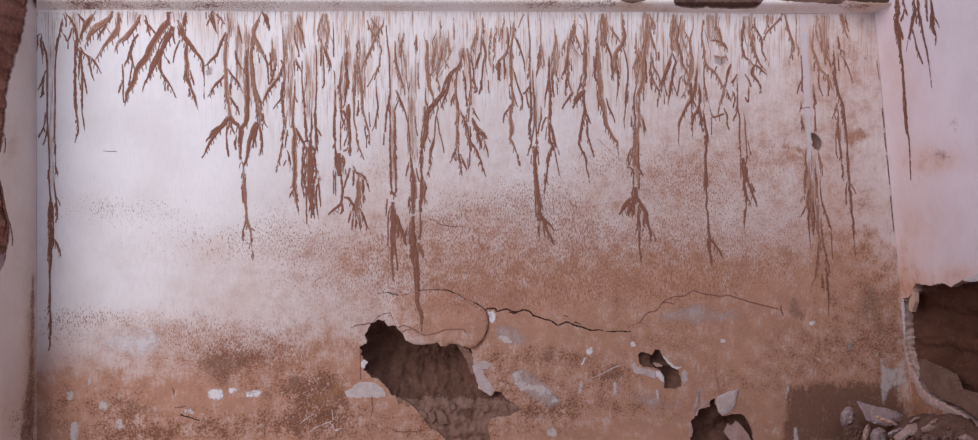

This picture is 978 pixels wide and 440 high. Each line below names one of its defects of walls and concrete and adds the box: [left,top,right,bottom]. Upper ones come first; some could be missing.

water stain [893,0,940,180]
water stain [37,10,857,351]
spalling [344,319,519,440]
flaking render [488,310,523,343]
flaking render [512,370,558,406]
crack [351,289,784,344]
spalling [630,341,688,407]
spalling [689,389,754,440]
water stain [783,383,905,440]
spalling [881,274,978,426]